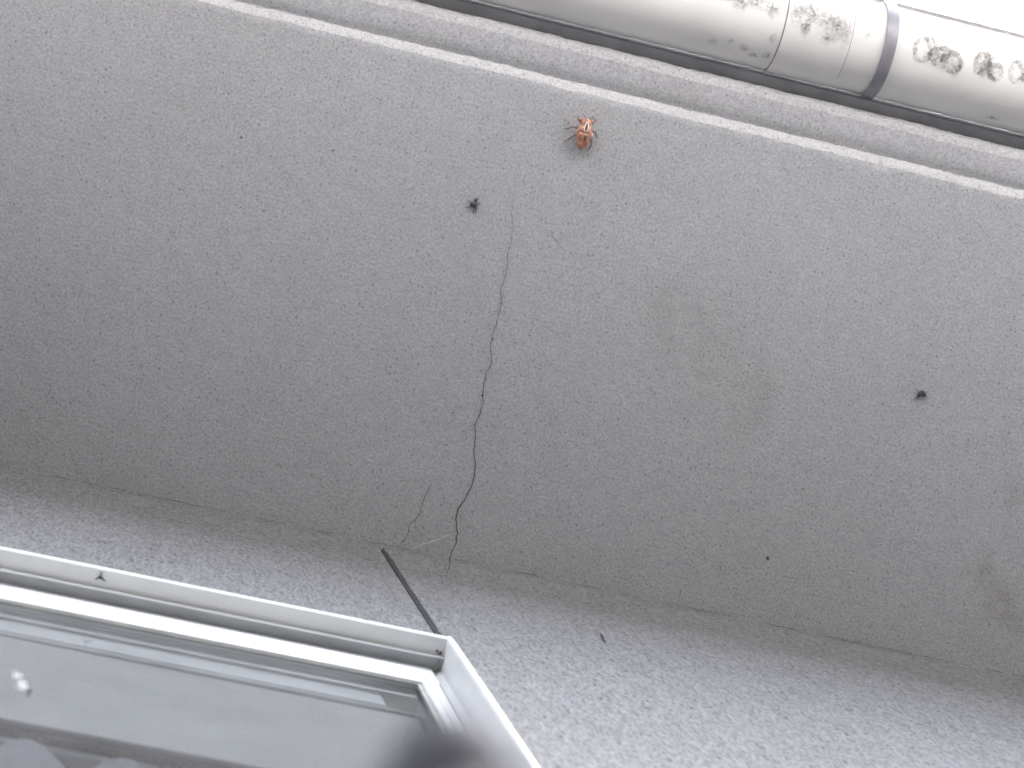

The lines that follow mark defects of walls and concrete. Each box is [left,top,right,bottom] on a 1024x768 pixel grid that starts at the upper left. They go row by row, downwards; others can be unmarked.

crack [446,177,516,579]